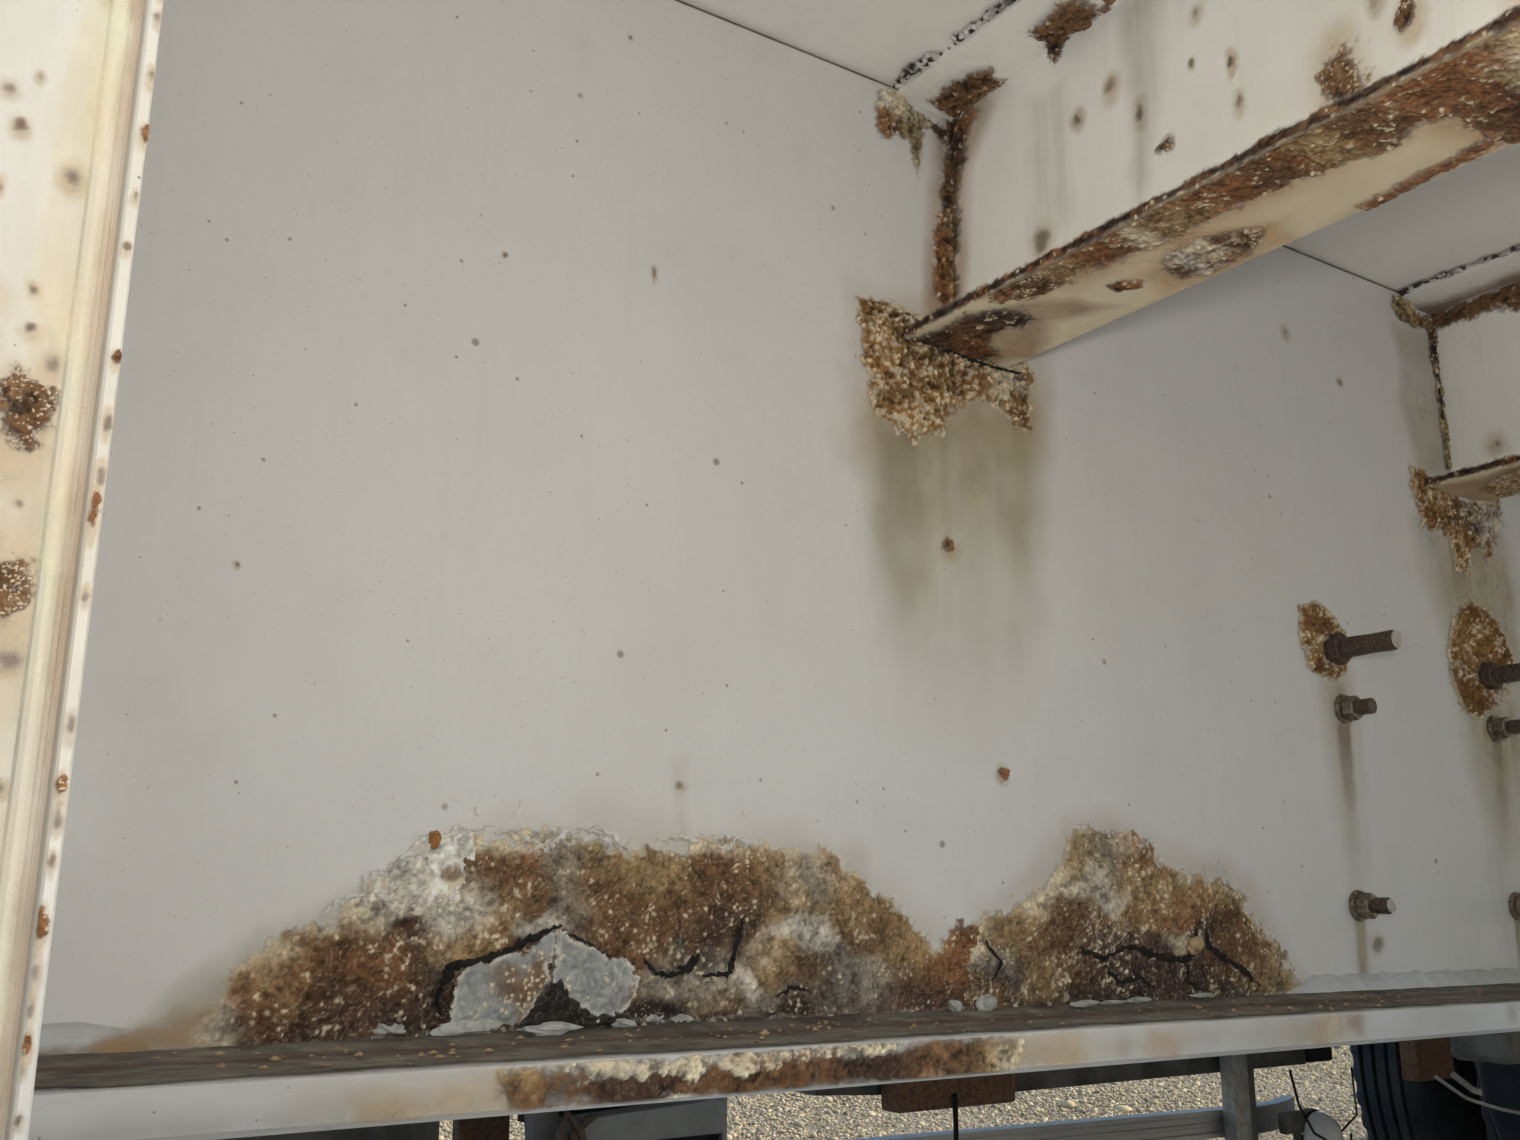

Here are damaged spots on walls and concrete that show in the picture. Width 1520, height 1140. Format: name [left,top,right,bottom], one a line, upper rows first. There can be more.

corrosion [855,0,1520,461]
corrosion [0,360,60,452]
corrosion [1392,275,1520,789]
corrosion [0,558,37,620]
corrosion [1298,600,1348,695]
peeling [322,796,630,915]
corrosion [1358,921,1381,972]
corrosion [496,1037,1025,1110]